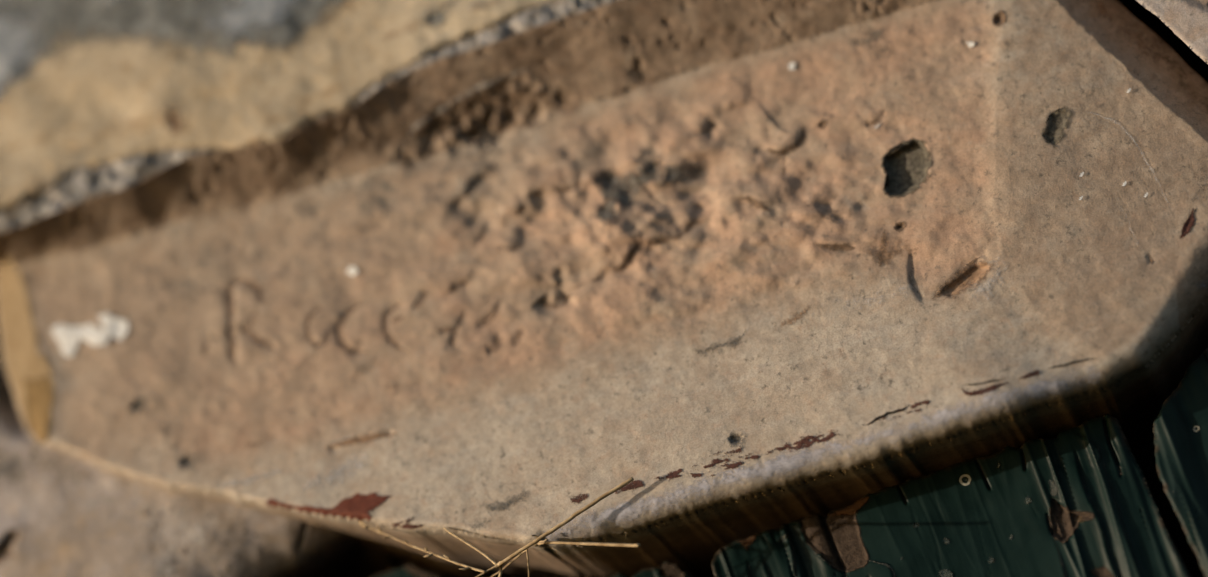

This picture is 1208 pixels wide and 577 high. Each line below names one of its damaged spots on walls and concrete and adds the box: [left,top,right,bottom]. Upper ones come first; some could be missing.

spalling [881,138,932,198]
peeling [777,495,896,577]
peeling [1047,478,1101,577]